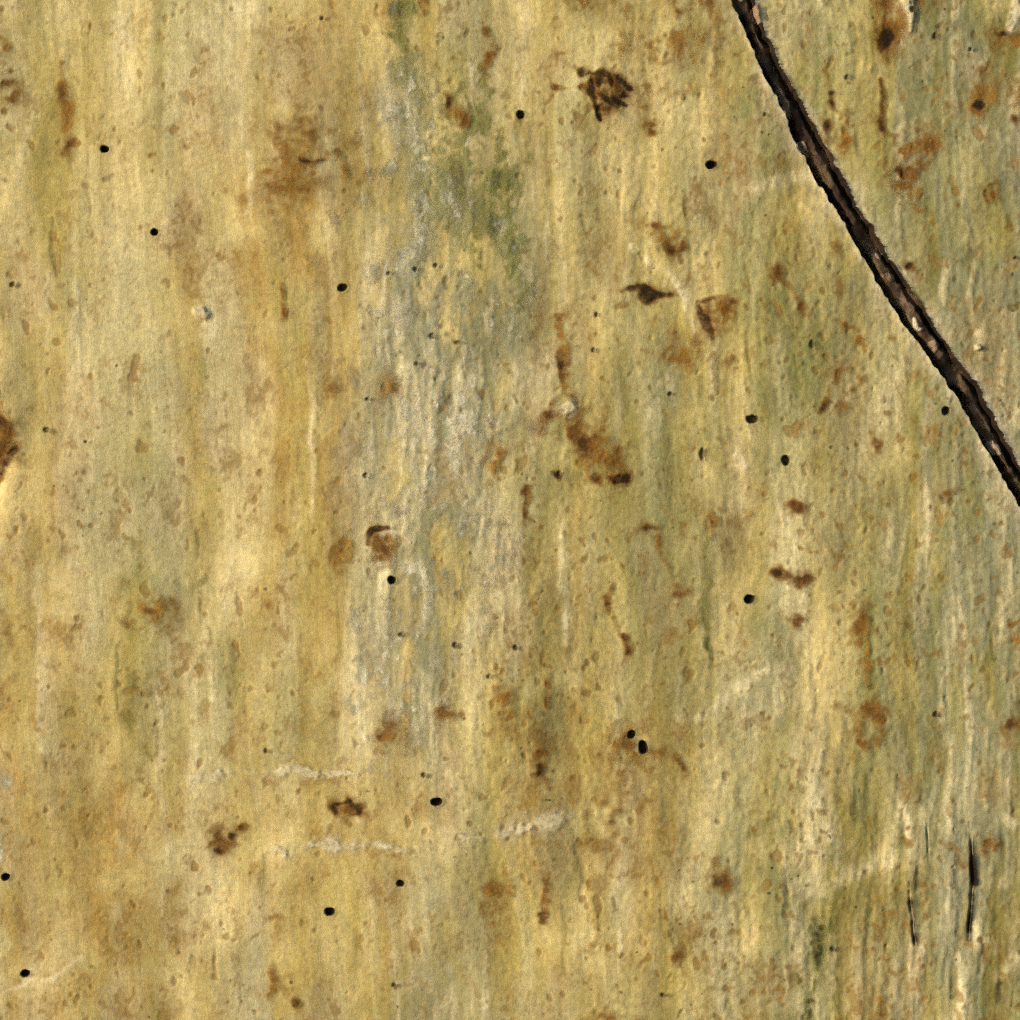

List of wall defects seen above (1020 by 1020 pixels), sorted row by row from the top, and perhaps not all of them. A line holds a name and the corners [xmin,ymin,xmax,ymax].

water stain [377,0,426,171]
rust [577,67,634,122]
rust [874,0,906,63]
water stain [485,168,531,332]
rust [620,283,674,305]
rust [697,295,738,341]
crack [733,0,1020,506]
rust [0,415,19,482]
water stain [381,345,495,538]
rust [544,313,632,485]
water stain [391,561,450,615]
water stain [355,624,431,743]